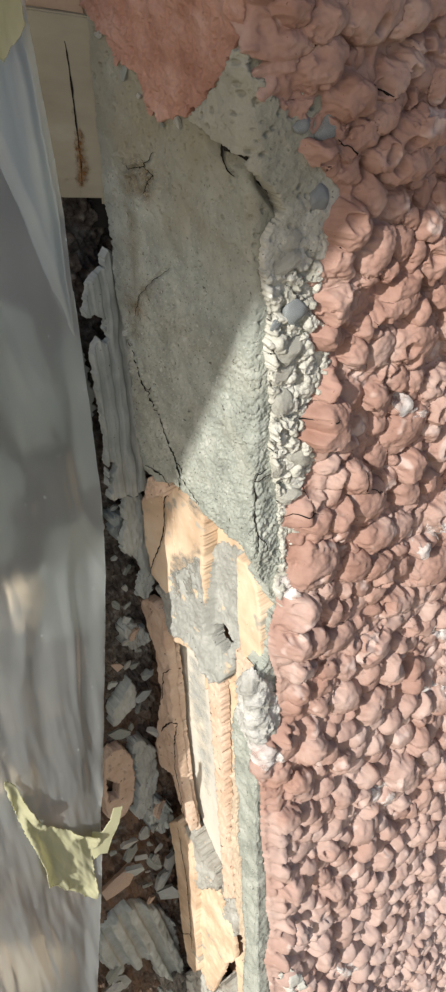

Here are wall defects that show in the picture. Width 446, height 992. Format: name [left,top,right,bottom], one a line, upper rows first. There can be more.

corrosion [75,131,87,186]
crack [220,144,267,192]
crack [128,339,199,577]
spalling [85,9,340,992]
crack [253,469,323,558]